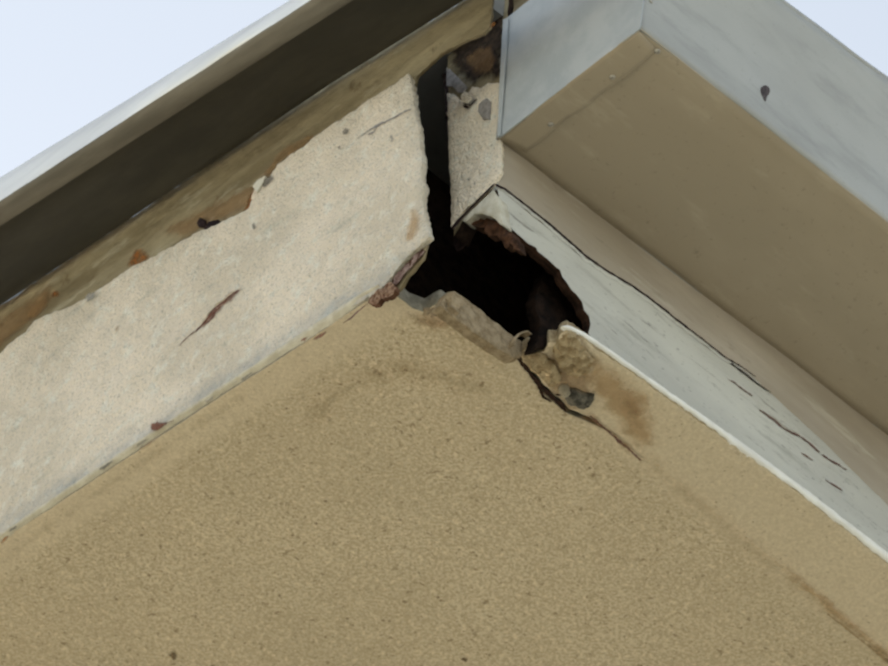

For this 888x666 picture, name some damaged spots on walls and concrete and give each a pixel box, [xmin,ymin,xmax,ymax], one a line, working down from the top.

crack [358,109,411,138]
crack [442,72,477,132]
peeling [253,176,273,193]
rust [129,250,147,266]
spalling [422,291,594,410]
crack [451,184,847,490]
crack [827,613,888,662]